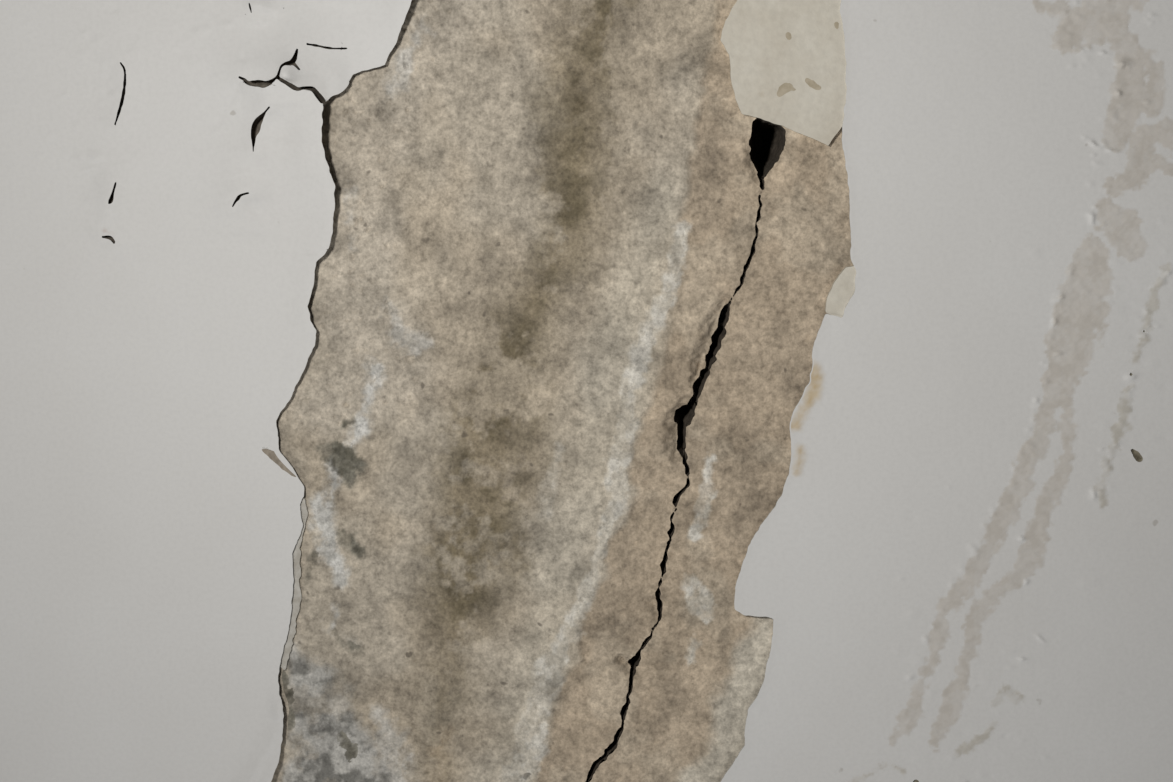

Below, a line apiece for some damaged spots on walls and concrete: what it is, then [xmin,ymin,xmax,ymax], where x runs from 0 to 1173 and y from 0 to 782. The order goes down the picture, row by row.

peeling [240,0,545,782]
peeling [470,0,856,782]
crack [586,118,786,782]
damp [850,0,1173,782]